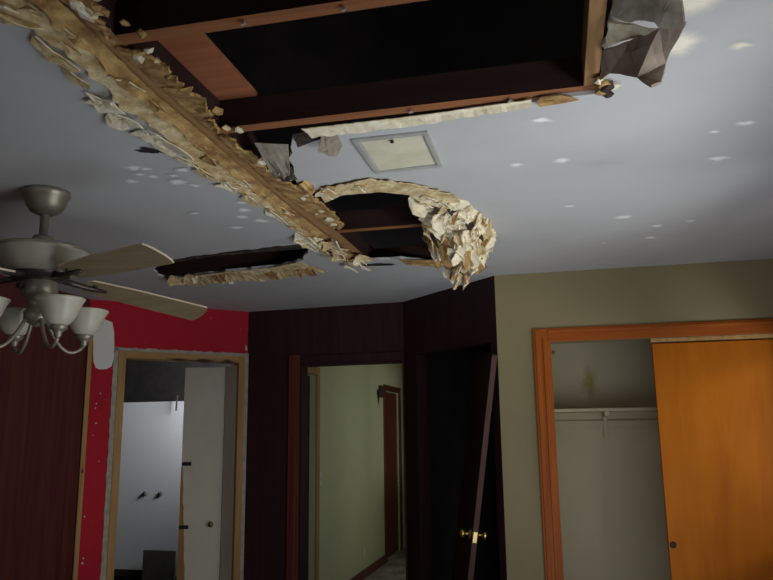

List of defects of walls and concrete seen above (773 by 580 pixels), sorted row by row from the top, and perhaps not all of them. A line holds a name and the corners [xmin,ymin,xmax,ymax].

spalling [61,0,373,273]
peeling [167,273,198,286]
peeling [408,195,493,290]